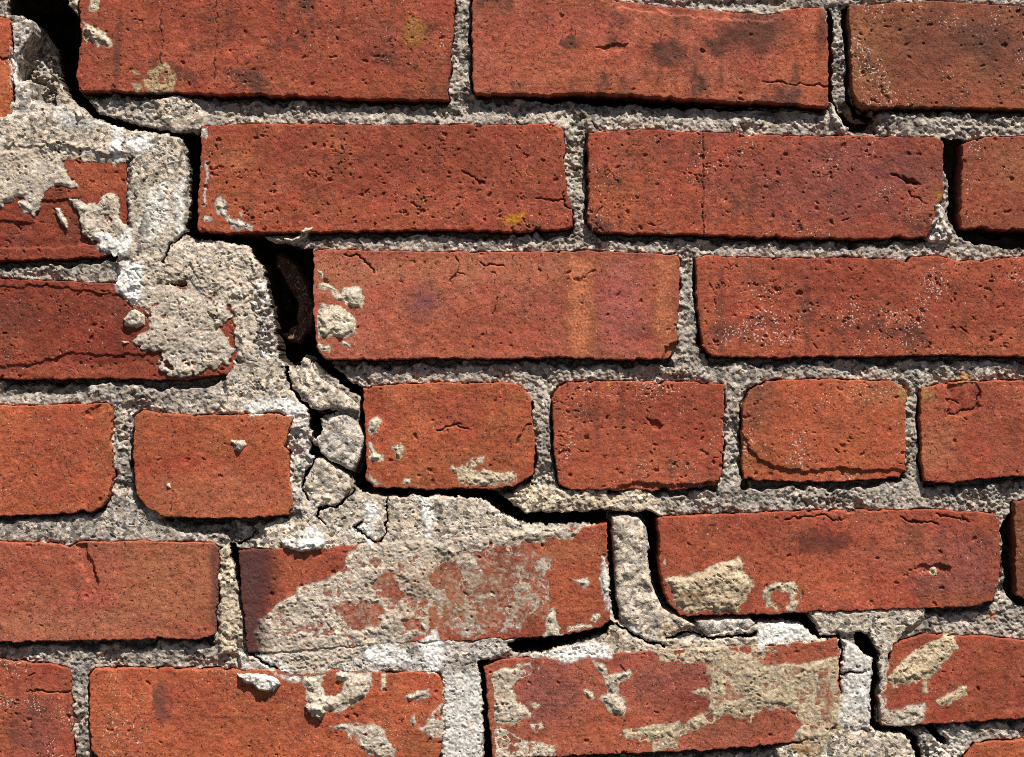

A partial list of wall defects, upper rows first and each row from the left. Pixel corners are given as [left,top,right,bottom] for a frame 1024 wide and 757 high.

crack [766,80,828,88]
spalling [0,193,131,250]
crack [7,0,611,562]
spalling [0,352,201,382]
crack [230,531,256,586]
peeling [441,525,583,572]
crack [639,510,665,602]
peeling [542,607,600,638]
crack [507,575,947,757]
crack [477,660,491,757]
peeling [491,662,556,757]
peeling [623,721,682,752]